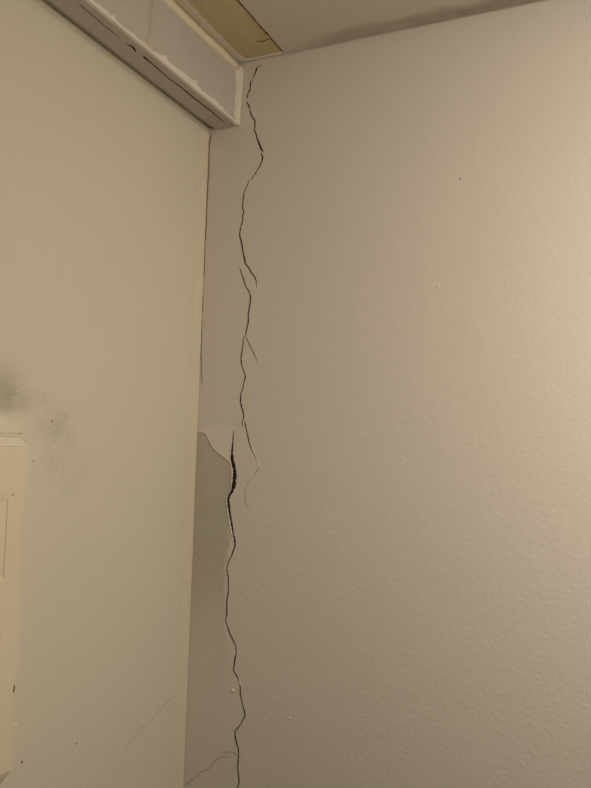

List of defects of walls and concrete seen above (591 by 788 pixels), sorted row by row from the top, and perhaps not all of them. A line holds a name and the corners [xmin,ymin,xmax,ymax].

peeling [88,0,236,122]
peeling [194,426,234,564]
crack [186,64,268,788]